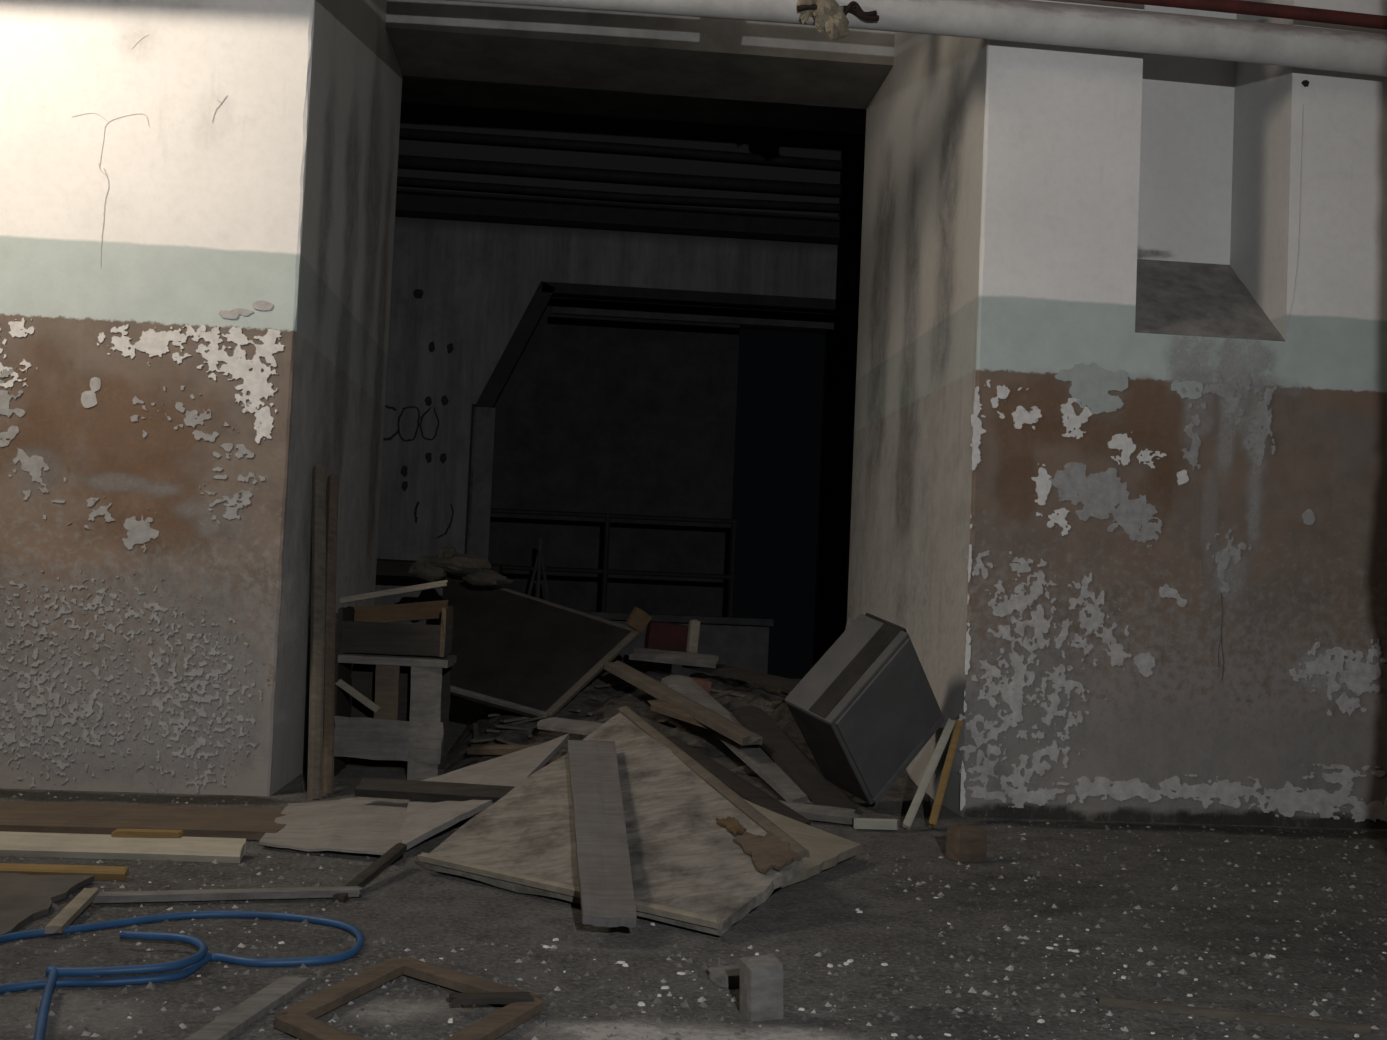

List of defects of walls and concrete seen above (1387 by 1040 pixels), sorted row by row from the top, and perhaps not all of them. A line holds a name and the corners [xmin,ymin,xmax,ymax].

peeling [0,318,65,519]
spalling [81,377,101,408]
peeling [67,494,159,553]
peeling [97,300,285,524]
peeling [970,380,1042,470]
spalling [1031,362,1277,548]
peeling [958,514,1387,822]